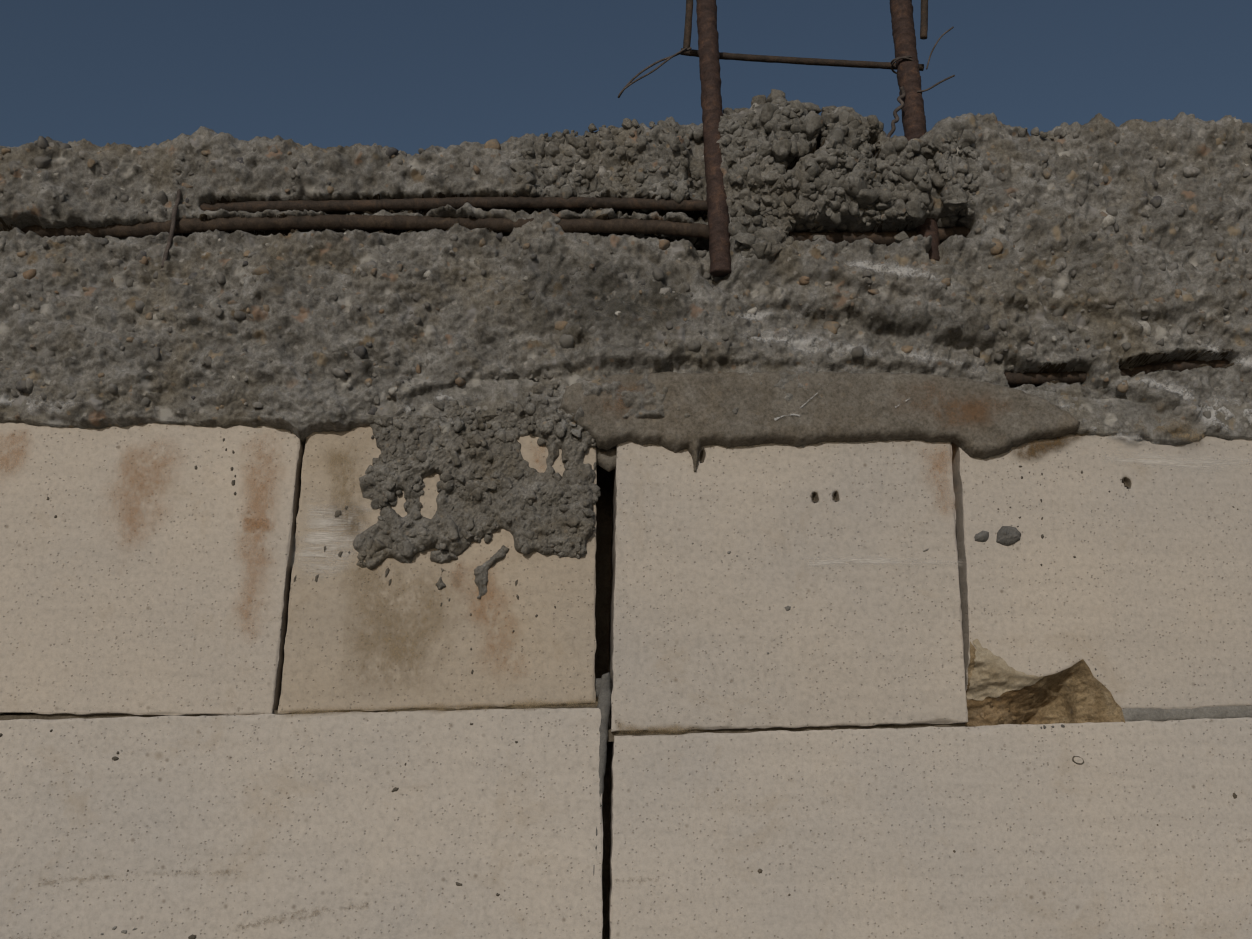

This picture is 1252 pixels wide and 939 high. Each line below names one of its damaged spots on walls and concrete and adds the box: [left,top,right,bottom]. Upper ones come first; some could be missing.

spalling [0,136,108,211]
spalling [1025,127,1120,206]
spalling [0,229,66,357]
spalling [21,142,790,360]
spalling [788,221,918,359]
spalling [938,143,1252,396]
spalling [3,368,151,413]
spalling [317,339,440,415]
peeling [430,549,458,607]
peeling [474,545,509,600]
spalling [965,639,1125,729]